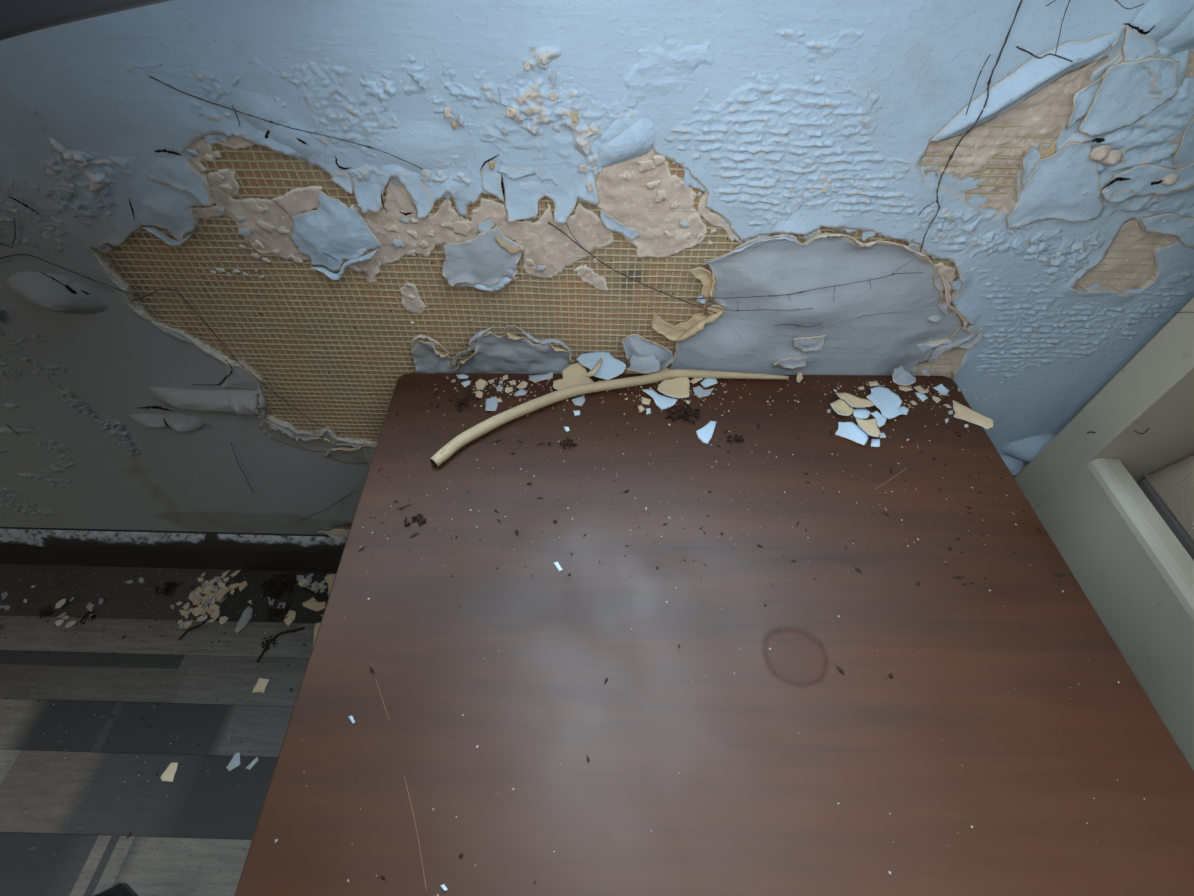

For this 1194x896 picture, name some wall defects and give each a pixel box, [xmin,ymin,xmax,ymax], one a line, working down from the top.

crack [0,197,39,248]
peeling [91,105,993,466]
peeling [919,0,1194,290]